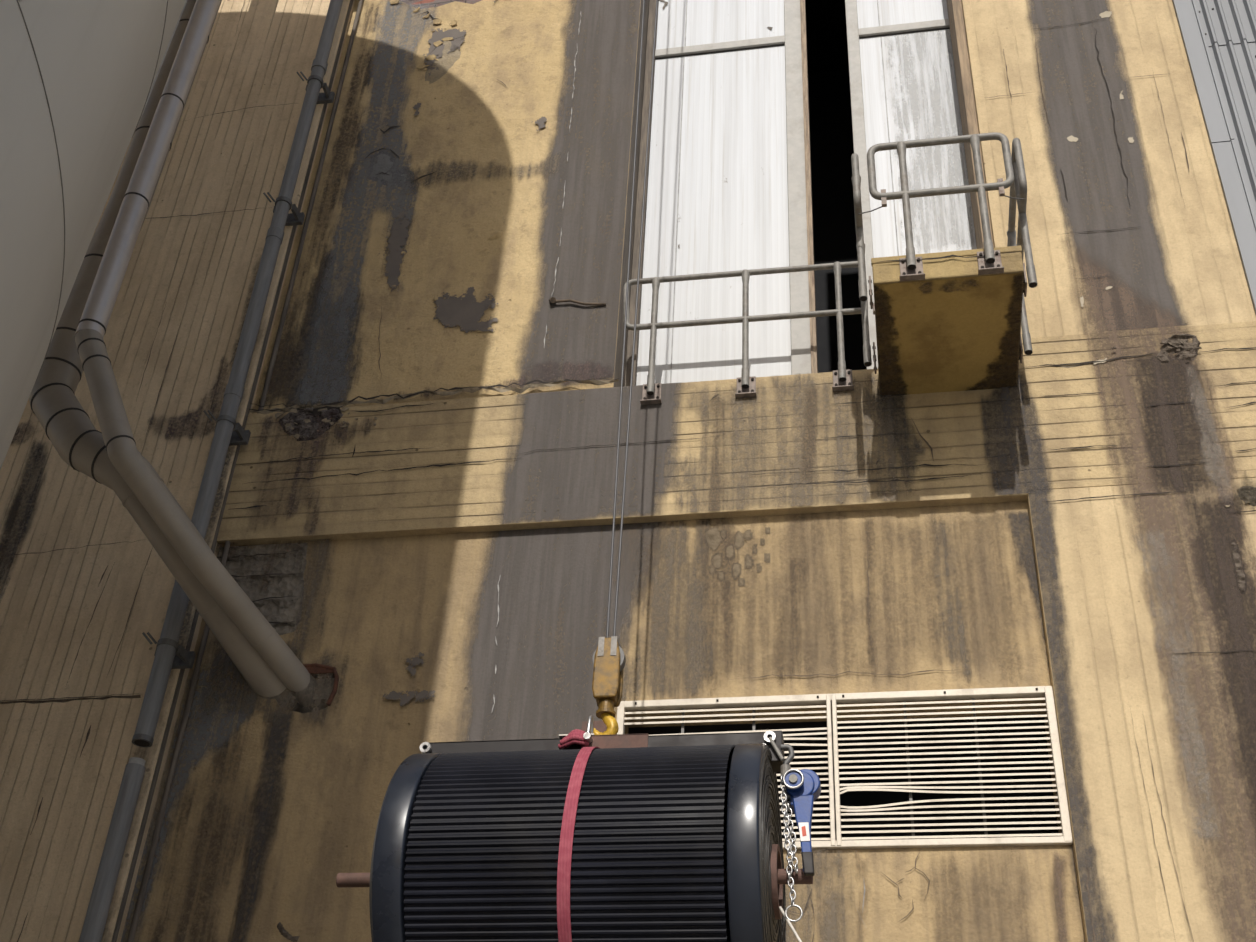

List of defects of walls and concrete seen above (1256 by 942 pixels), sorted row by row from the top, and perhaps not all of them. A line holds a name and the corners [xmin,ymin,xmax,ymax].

peeling [390,0,497,75]
crack [986,19,1189,235]
peeling [433,287,498,333]
leakage [265,0,712,741]
spalling [1156,333,1202,363]
spalling [275,404,358,441]
leakage [1029,0,1256,942]
spalling [1225,486,1256,508]
flaking render [217,543,308,635]
crack [0,540,153,756]